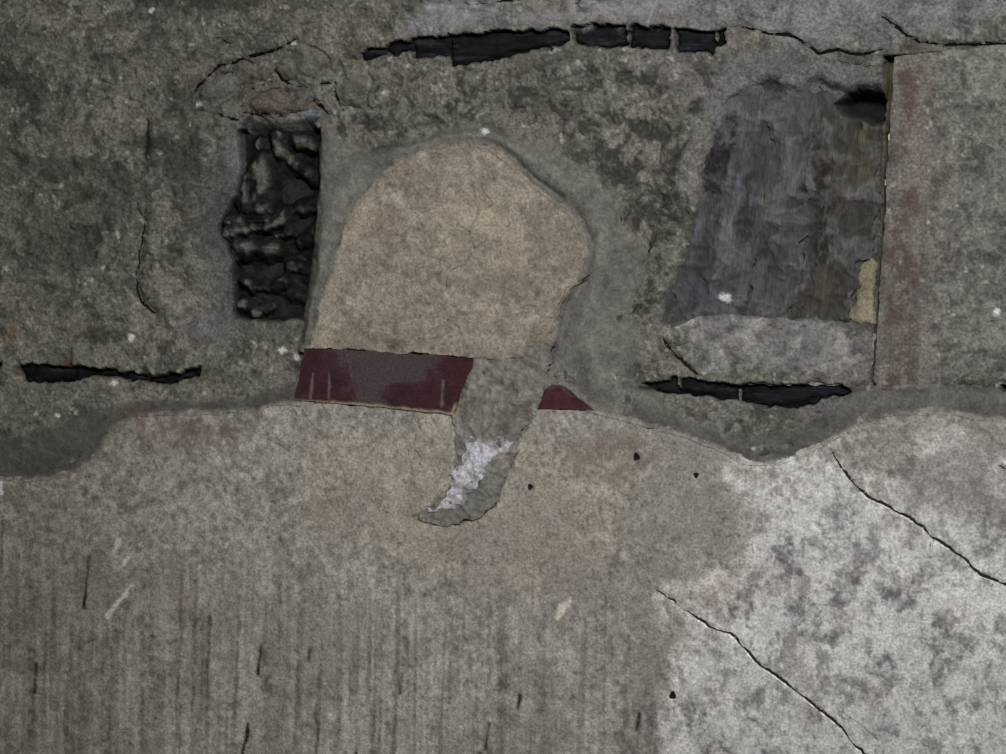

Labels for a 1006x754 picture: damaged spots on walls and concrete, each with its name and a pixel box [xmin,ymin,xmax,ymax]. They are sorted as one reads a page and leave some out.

crack [729,15,1006,76]
spalling [418,337,556,527]
crack [832,452,1006,587]
crack [657,590,868,754]